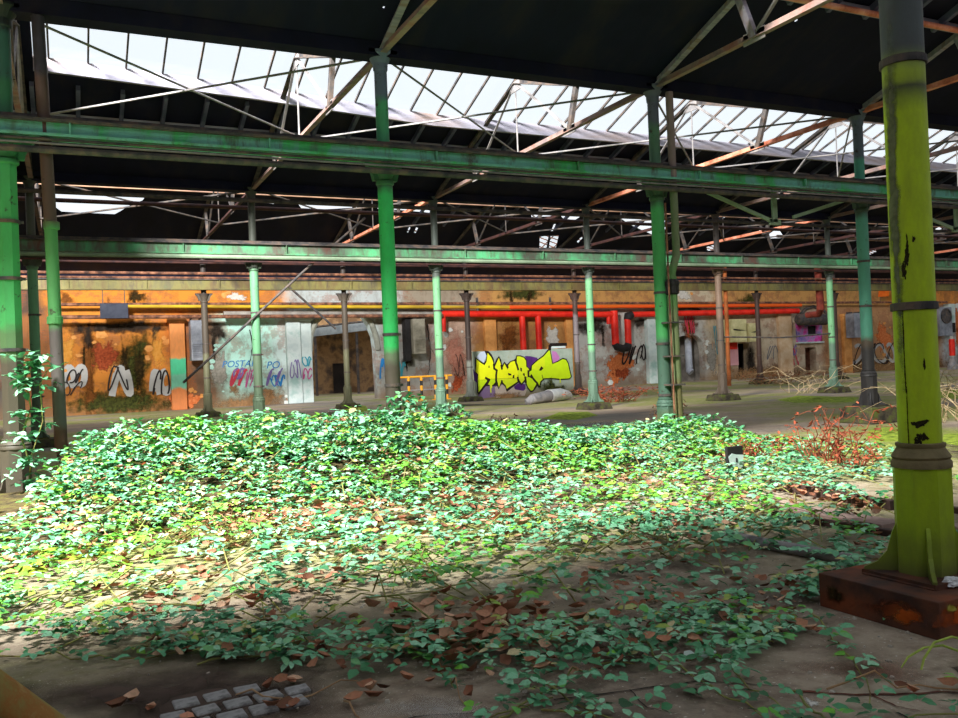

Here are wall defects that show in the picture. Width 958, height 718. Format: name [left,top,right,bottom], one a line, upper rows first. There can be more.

leakage [69,320,171,414]
spalling [874,310,930,444]